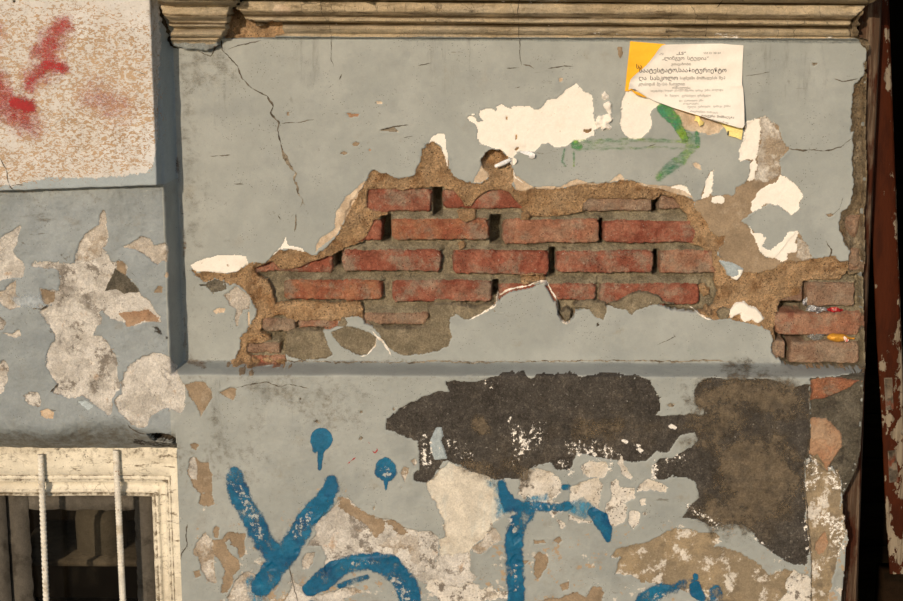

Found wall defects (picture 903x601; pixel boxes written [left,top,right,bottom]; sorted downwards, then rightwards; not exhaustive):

crack [159,6,177,48]
crack [199,39,308,232]
peeling [0,210,236,428]
spalling [187,0,875,601]